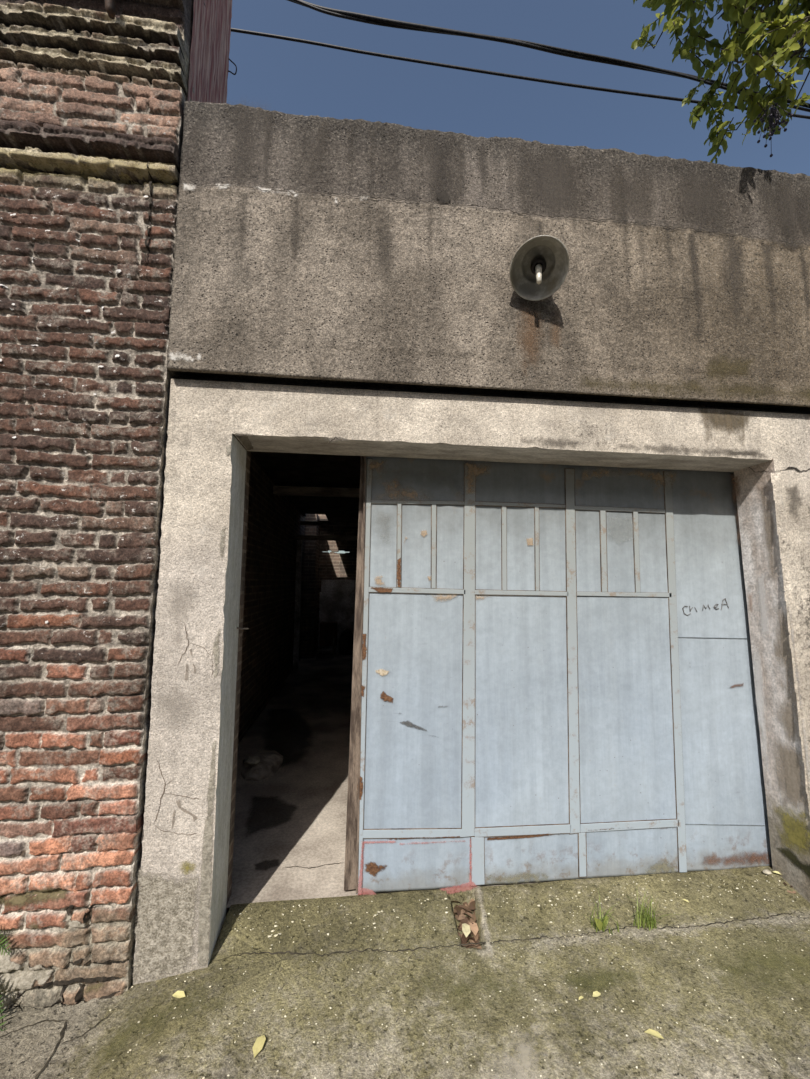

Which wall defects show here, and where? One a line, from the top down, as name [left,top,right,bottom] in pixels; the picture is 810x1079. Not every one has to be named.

crack [145,161,156,265]
leakage [788,486,801,513]
corrosion [372,558,401,593]
leakage [755,654,767,756]
corrosion [365,862,386,876]
corrosion [707,853,767,864]
crack [212,910,798,961]
crack [0,958,122,1079]